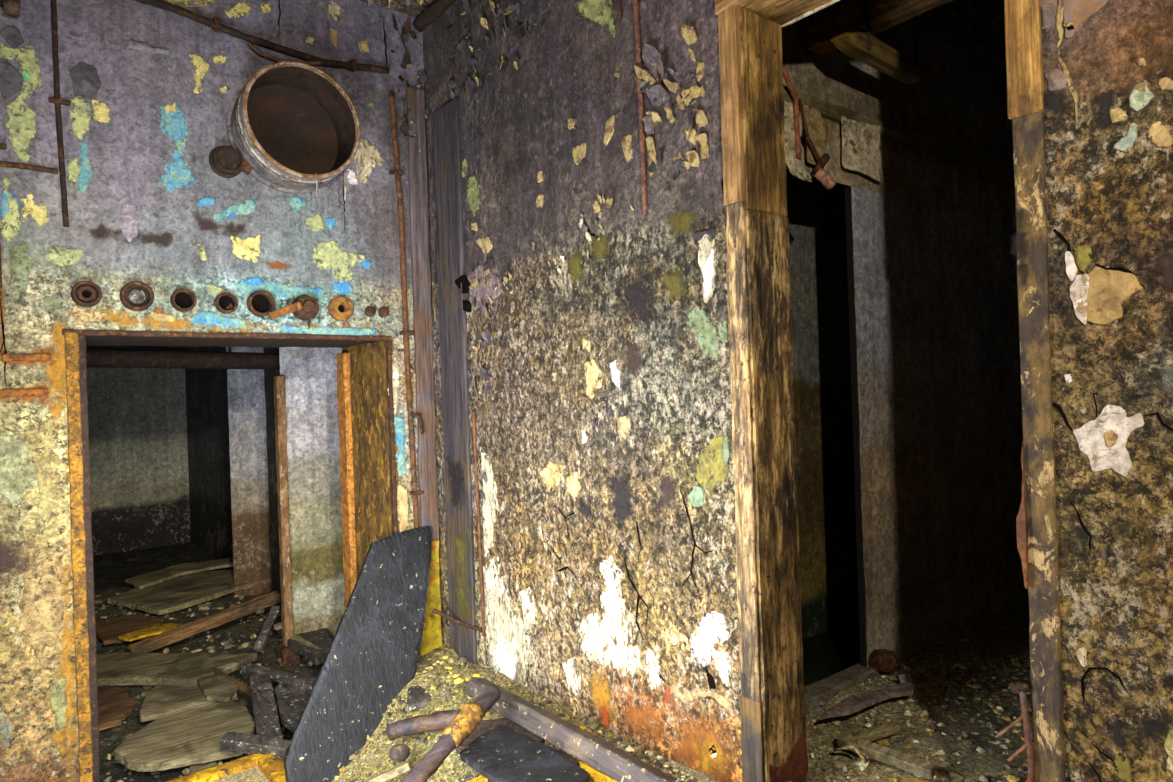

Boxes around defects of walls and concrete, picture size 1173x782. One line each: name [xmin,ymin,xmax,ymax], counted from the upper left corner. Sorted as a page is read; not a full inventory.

peeling [603,25,710,193]
corrosion [81,308,191,331]
peeling [191,196,371,330]
peeling [280,324,376,336]
spalling [1065,245,1143,325]
crack [1052,393,1097,432]
spalling [1073,405,1144,477]
crack [1145,412,1173,431]
crack [1070,502,1092,552]
spalling [562,555,735,712]
corrosion [53,615,75,762]
corrosion [592,677,734,782]